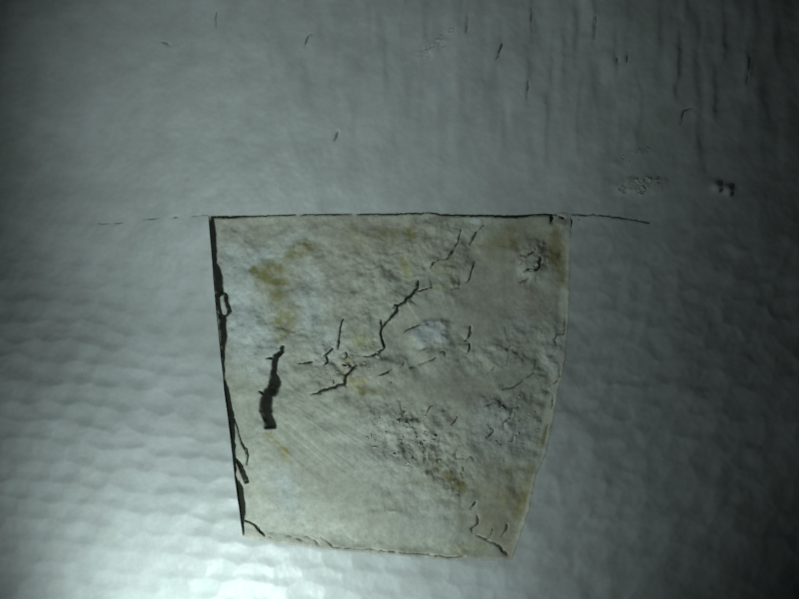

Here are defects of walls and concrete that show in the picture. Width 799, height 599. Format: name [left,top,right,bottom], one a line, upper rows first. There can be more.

water stain [338,223,420,281]
water stain [543,220,571,290]
water stain [246,234,316,353]
flaking render [209,212,571,560]
crack [206,212,650,538]
water stain [440,459,536,524]
crack [470,501,508,554]